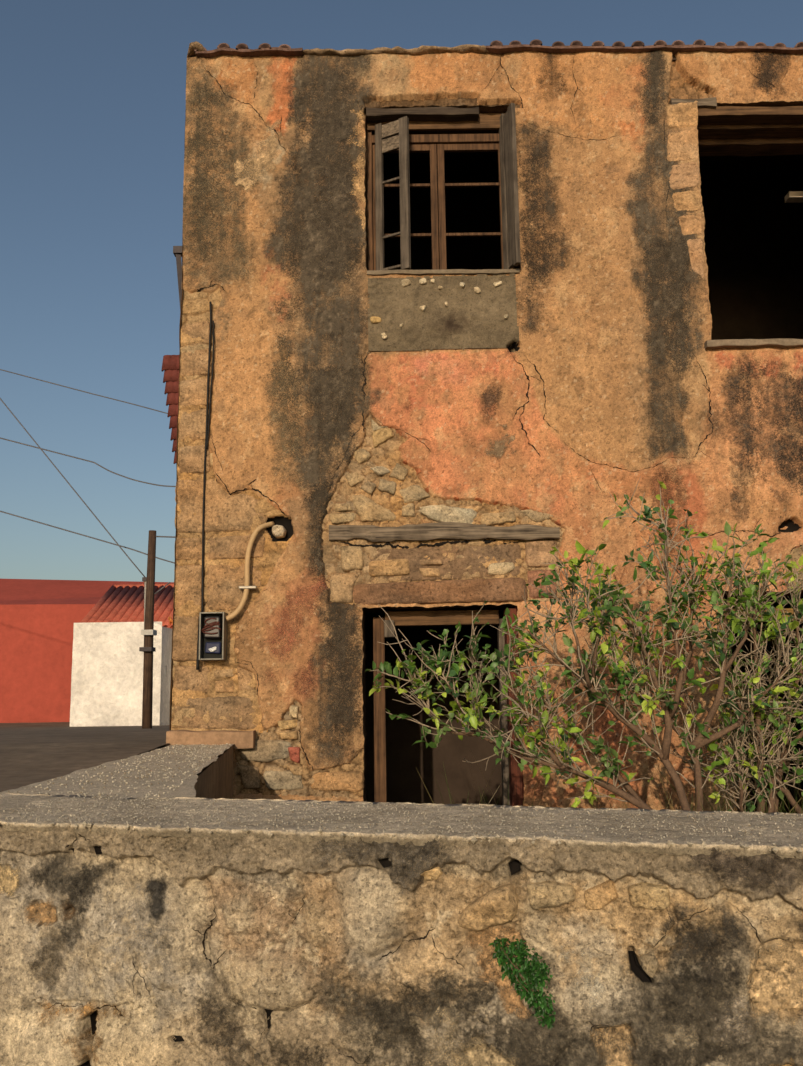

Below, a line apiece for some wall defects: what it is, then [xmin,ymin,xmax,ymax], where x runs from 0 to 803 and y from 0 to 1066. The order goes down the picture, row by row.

crack [204,66,288,154]
water stain [624,50,707,552]
crack [211,433,285,515]
spalling [171,288,364,800]
water stain [182,55,380,767]
spalling [321,414,565,608]
crack [512,355,714,493]
water stain [705,361,803,517]
water stain [62,864,91,946]
water stain [639,925,756,1066]